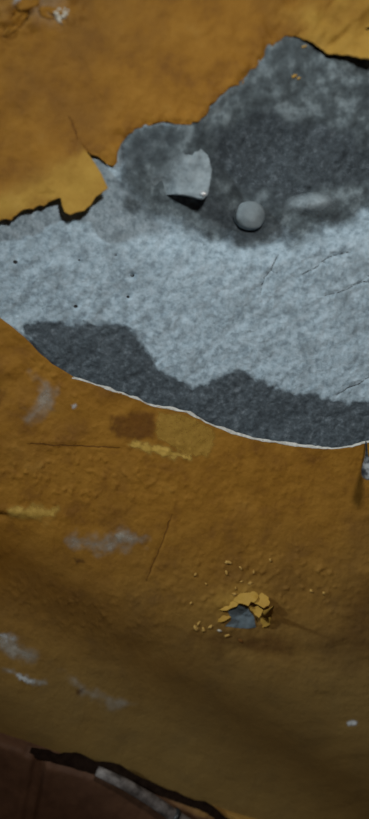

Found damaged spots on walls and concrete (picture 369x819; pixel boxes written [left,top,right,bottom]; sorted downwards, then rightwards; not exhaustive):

peeling [2,0,70,37]
peeling [292,0,369,59]
peeling [0,140,369,405]
peeling [72,377,369,480]
peeling [193,570,274,643]